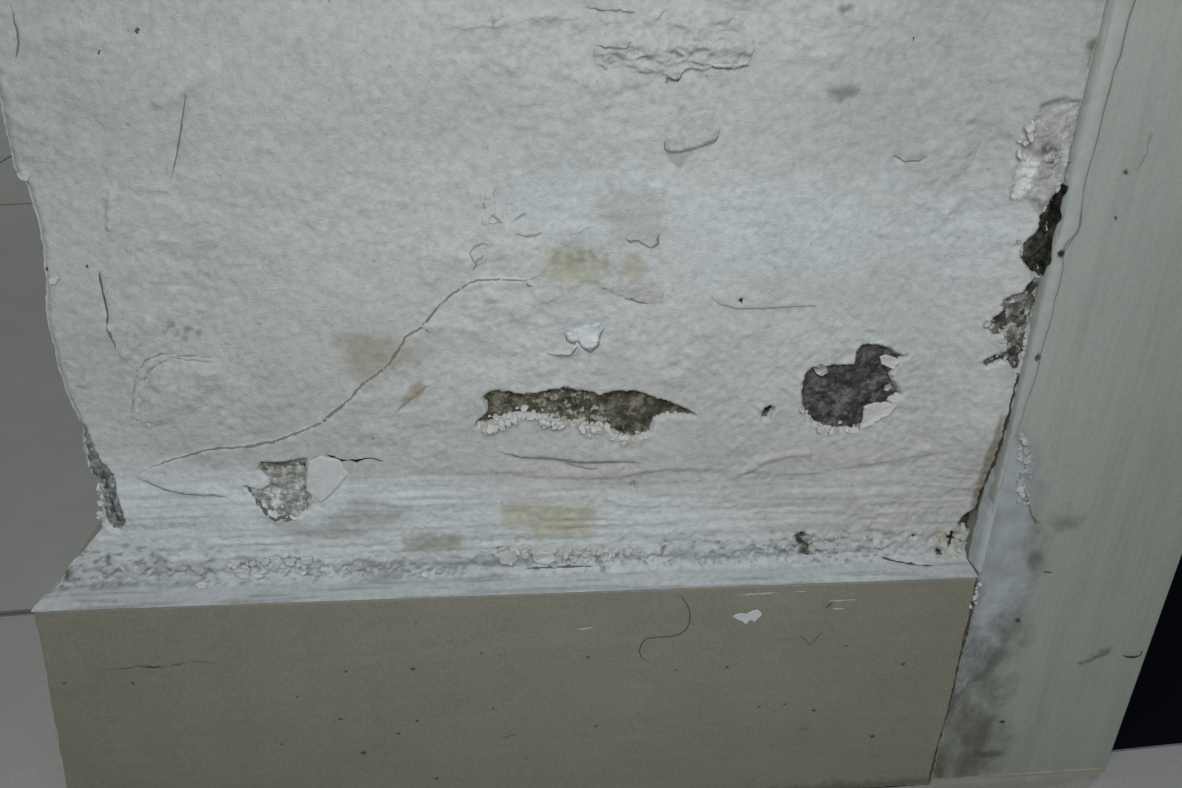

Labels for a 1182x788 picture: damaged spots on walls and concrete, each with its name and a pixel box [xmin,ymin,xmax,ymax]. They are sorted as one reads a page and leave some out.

spalling [983,100,1082,369]
crack [136,273,542,499]
spalling [477,386,691,447]
spalling [799,344,900,435]
spalling [84,425,125,529]
spalling [246,454,381,524]
spalling [220,552,466,585]
spalling [494,532,883,568]